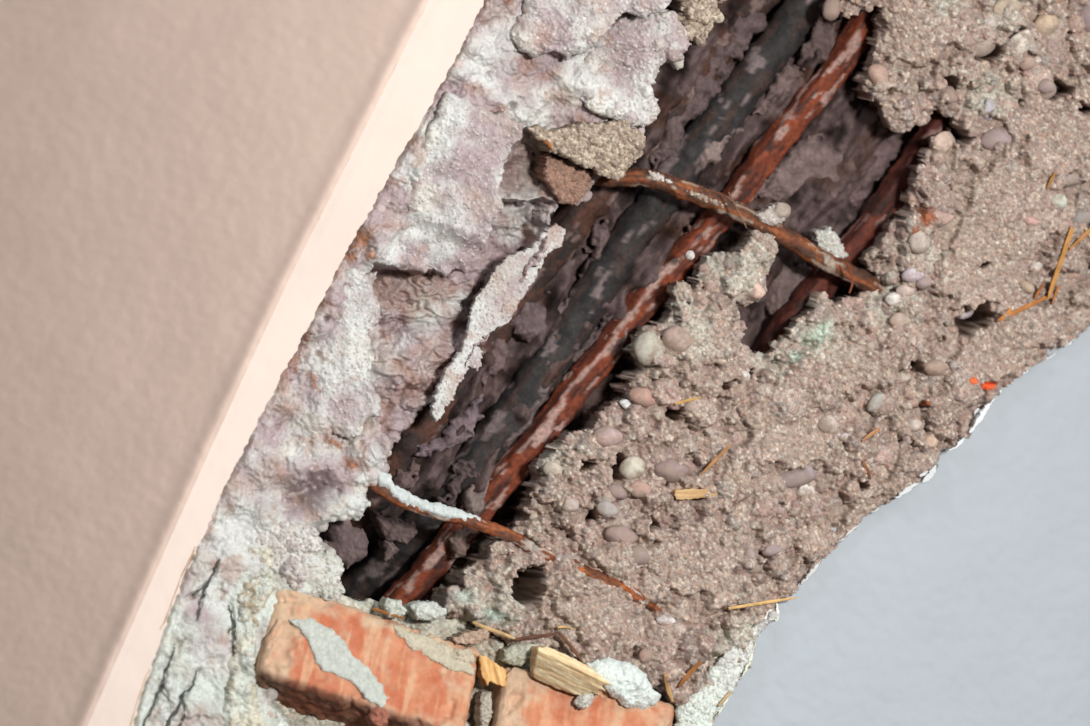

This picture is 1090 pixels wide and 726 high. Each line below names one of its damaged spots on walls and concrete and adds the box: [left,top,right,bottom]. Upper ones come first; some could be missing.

crack [130,547,220,726]
crack [228,605,236,655]
flaking render [133,0,783,726]
spalling [423,0,1090,726]